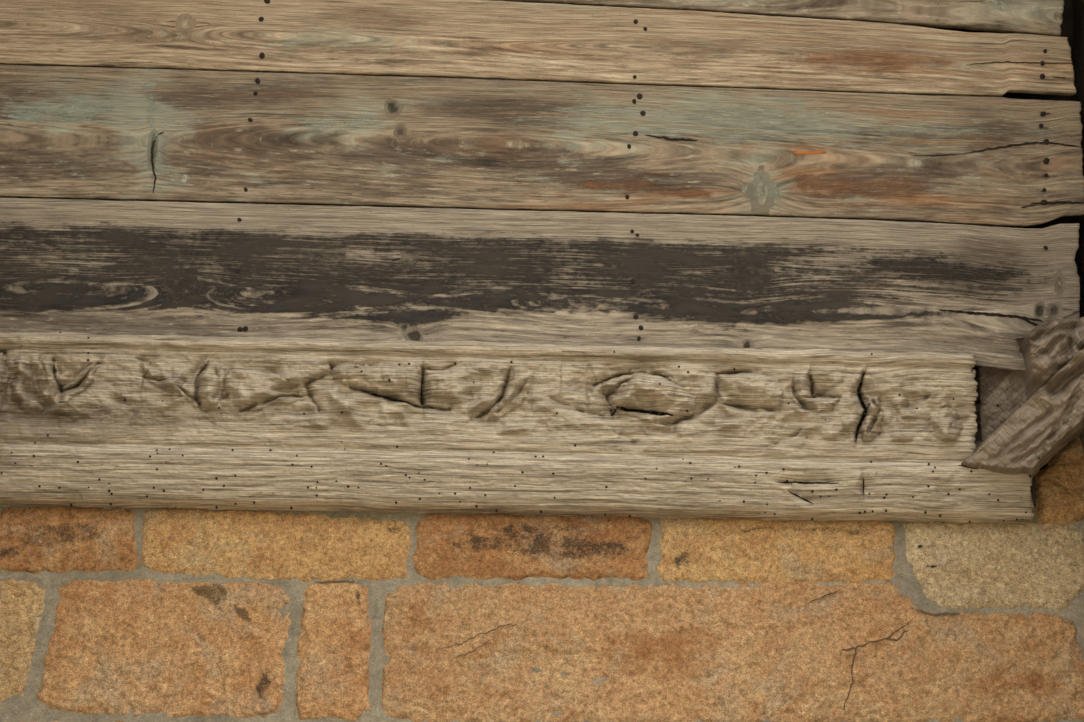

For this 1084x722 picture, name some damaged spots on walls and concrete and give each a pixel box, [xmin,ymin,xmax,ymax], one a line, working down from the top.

crack [151,132,164,193]
crack [912,141,1084,156]
crack [1020,200,1084,208]
leakage [0,221,1053,331]
crack [855,373,871,441]
crack [315,577,355,585]
crack [841,610,961,715]